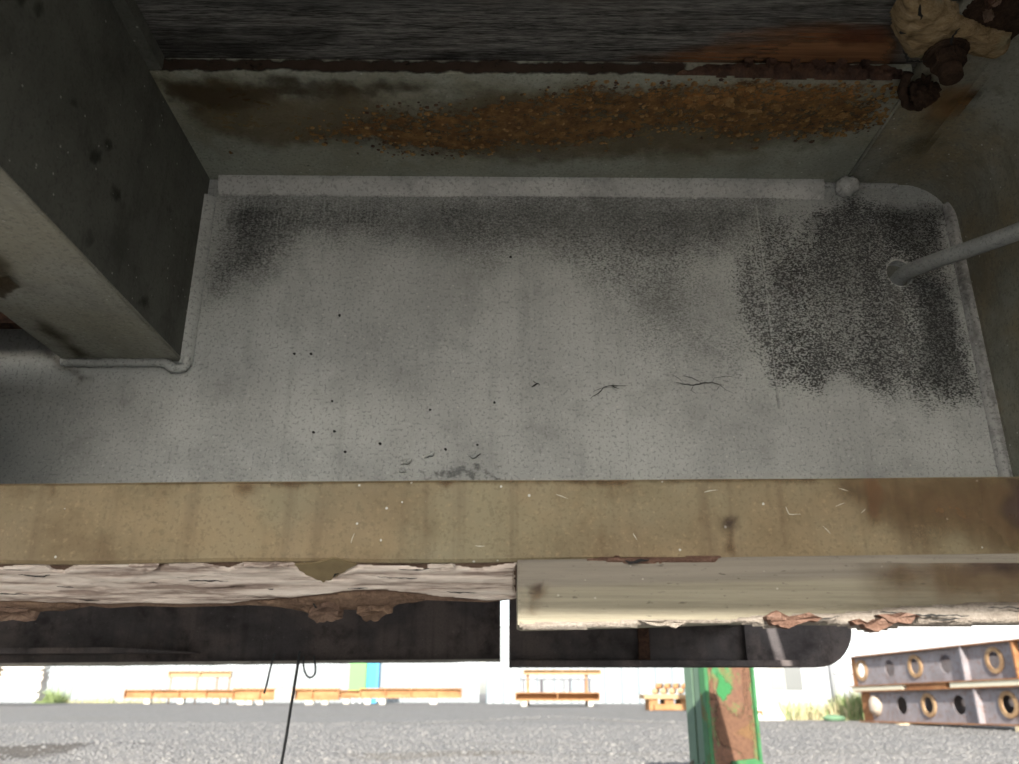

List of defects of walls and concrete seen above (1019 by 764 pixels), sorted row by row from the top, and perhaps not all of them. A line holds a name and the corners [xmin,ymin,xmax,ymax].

rust [167,71,923,161]
damp [216,193,983,415]
peeling [0,557,517,623]